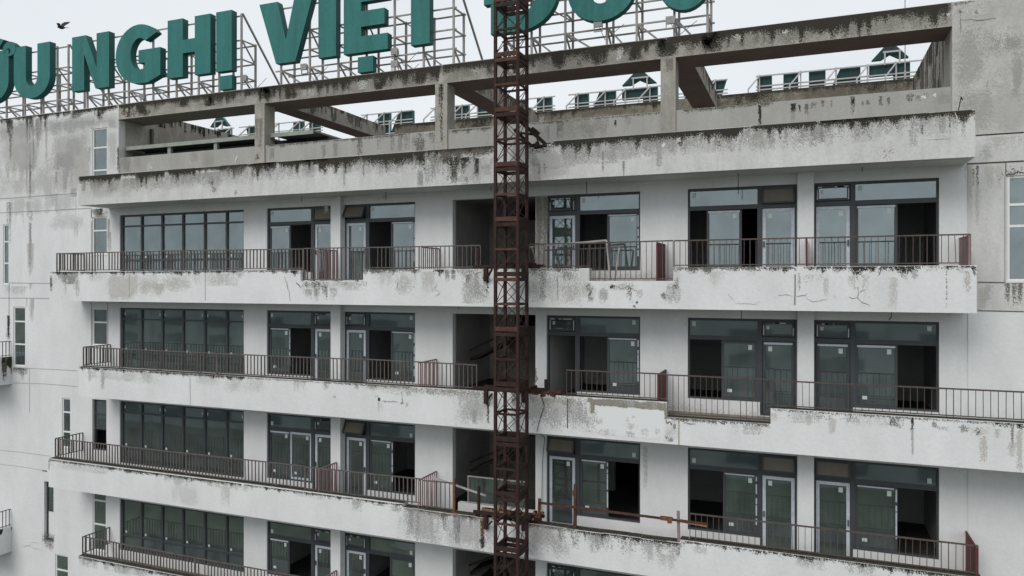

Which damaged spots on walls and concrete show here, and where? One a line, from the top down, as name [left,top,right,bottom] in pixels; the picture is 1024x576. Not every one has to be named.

damp [0,1,1024,319]
damp [80,367,410,407]
damp [453,392,493,426]
spalling [529,395,667,419]
damp [529,396,769,442]
damp [773,409,1024,455]
damp [48,459,494,551]
damp [79,557,177,576]
damp [529,524,958,576]